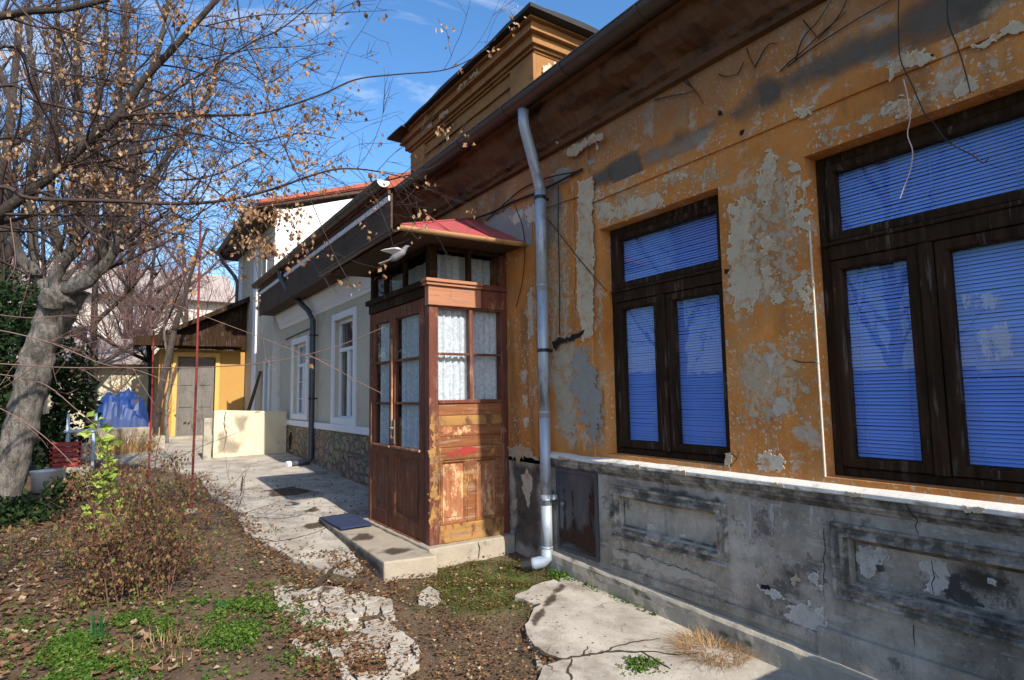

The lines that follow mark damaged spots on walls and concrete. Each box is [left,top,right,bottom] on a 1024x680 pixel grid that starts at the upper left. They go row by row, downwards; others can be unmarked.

flaking render [970,13,1024,49]
damp [732,0,993,116]
flaking render [886,48,936,82]
damp [592,135,701,185]
flaking render [726,148,815,314]
flaking render [549,133,688,460]
peeling [428,412,481,530]
flaking render [755,450,786,488]
rust [559,487,596,557]
peeling [757,583,828,631]
peeling [856,545,891,579]
peeling [919,559,985,608]